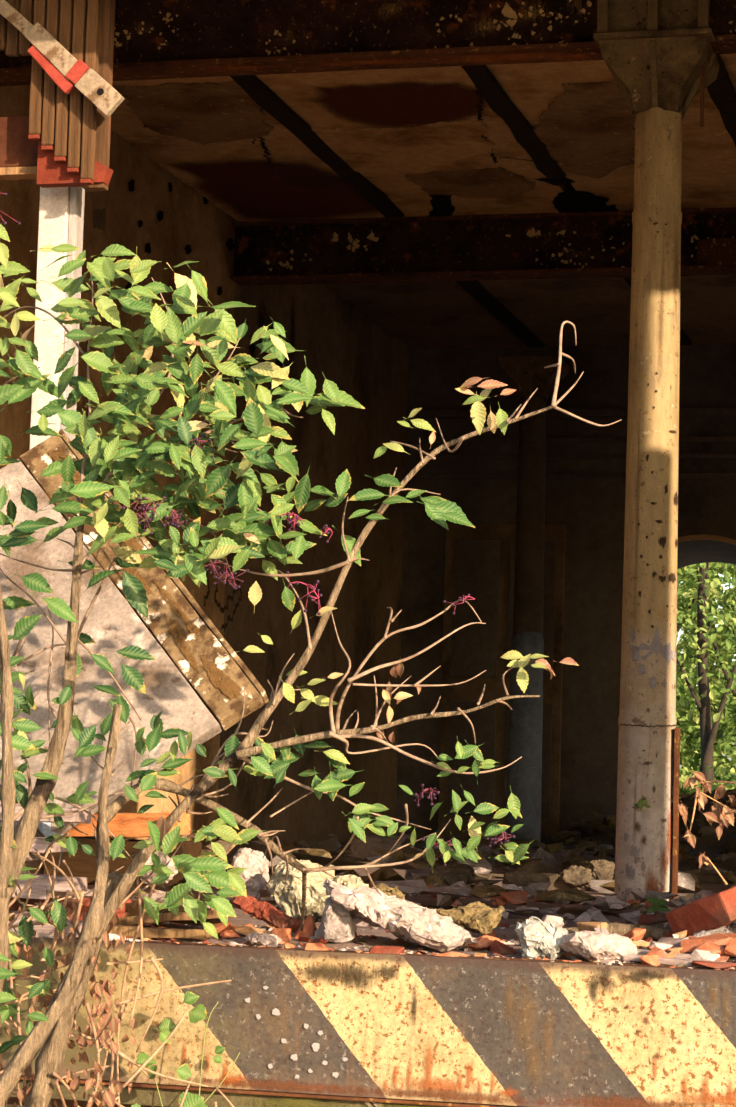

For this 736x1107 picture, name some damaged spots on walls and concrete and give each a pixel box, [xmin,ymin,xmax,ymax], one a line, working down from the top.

rust [203,1058,363,1093]
rust [377,1050,523,1105]
rust [566,1081,736,1107]